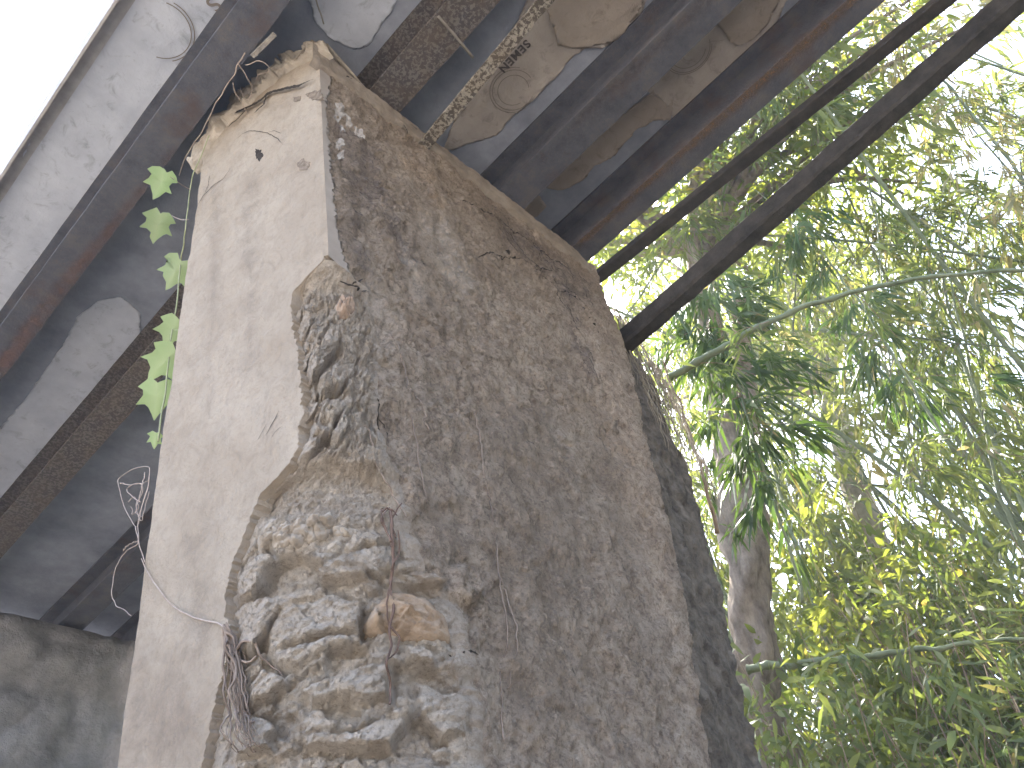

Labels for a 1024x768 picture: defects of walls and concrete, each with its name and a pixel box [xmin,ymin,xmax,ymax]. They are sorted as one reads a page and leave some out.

crack [223,79,313,140]
peeling [293,89,365,160]
spalling [212,260,486,768]